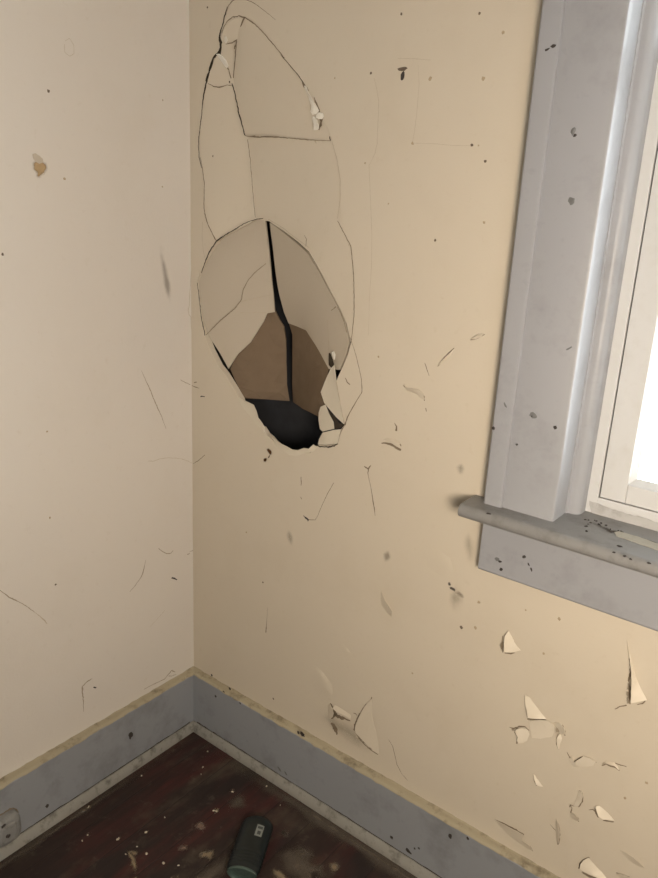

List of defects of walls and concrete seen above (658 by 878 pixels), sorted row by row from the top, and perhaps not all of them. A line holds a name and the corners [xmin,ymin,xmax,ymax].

crack [198,0,354,281]
spalling [197,18,354,456]
crack [317,306,362,448]
peeling [500,631,521,654]
peeling [615,640,647,709]
peeling [510,695,627,771]
peeling [569,790,614,822]
peeling [578,857,606,878]